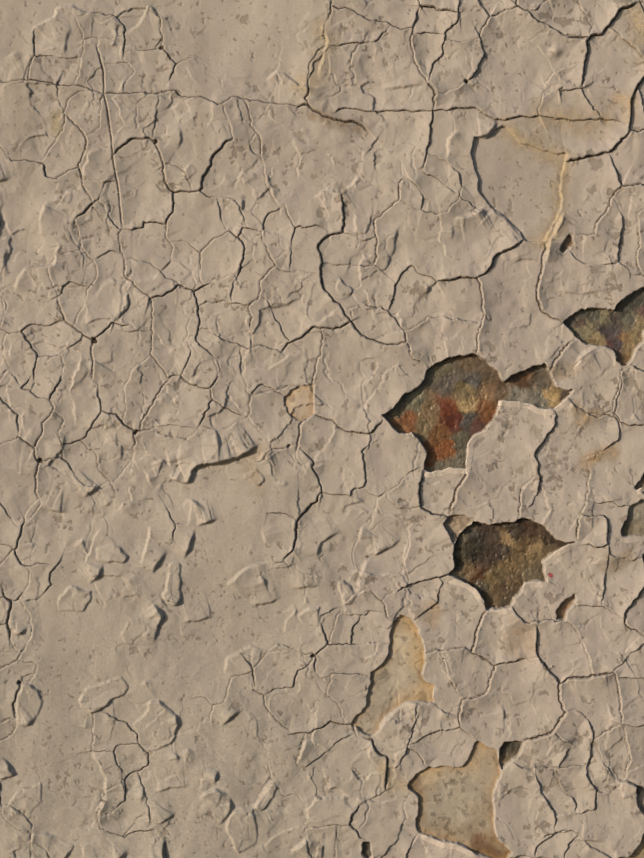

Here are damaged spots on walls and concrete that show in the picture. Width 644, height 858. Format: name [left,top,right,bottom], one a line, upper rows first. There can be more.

crack [0,0,644,499]
peeling [563,288,644,372]
peeling [384,354,578,478]
crack [0,503,53,593]
crack [259,414,383,565]
peeling [448,518,581,616]
crack [0,584,37,740]
crack [93,715,149,808]
crack [204,565,448,765]
peeling [352,615,439,735]
peeling [408,741,511,858]
crack [368,610,639,858]